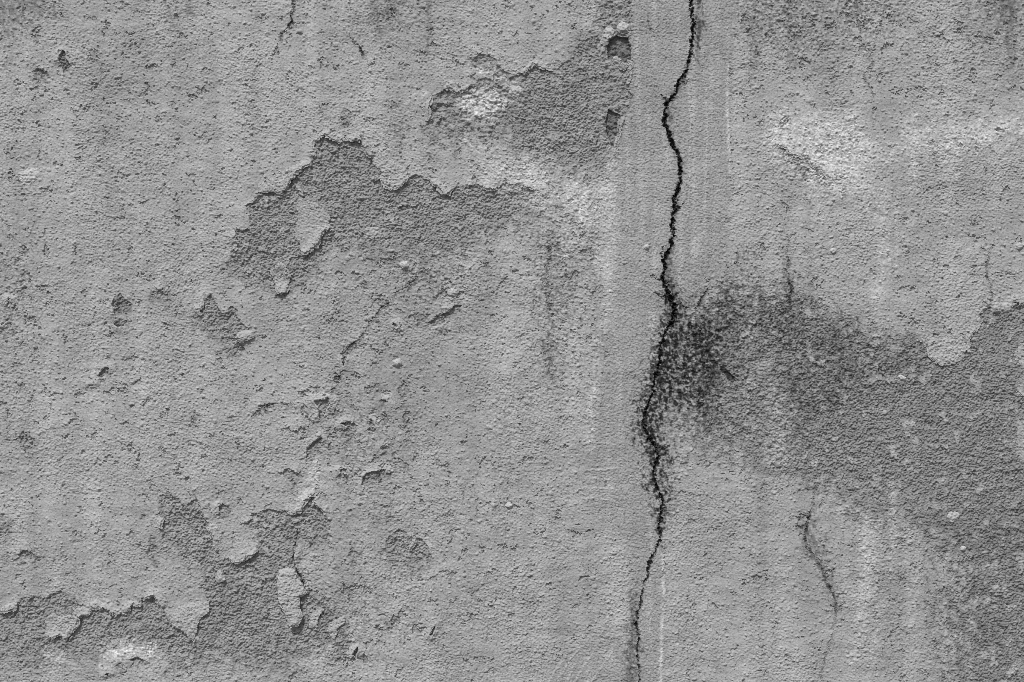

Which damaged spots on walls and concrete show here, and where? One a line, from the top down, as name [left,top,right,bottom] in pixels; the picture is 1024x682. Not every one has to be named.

peeling [220,0,633,302]
peeling [0,392,395,681]
crack [634,0,695,680]
mould [630,272,722,536]